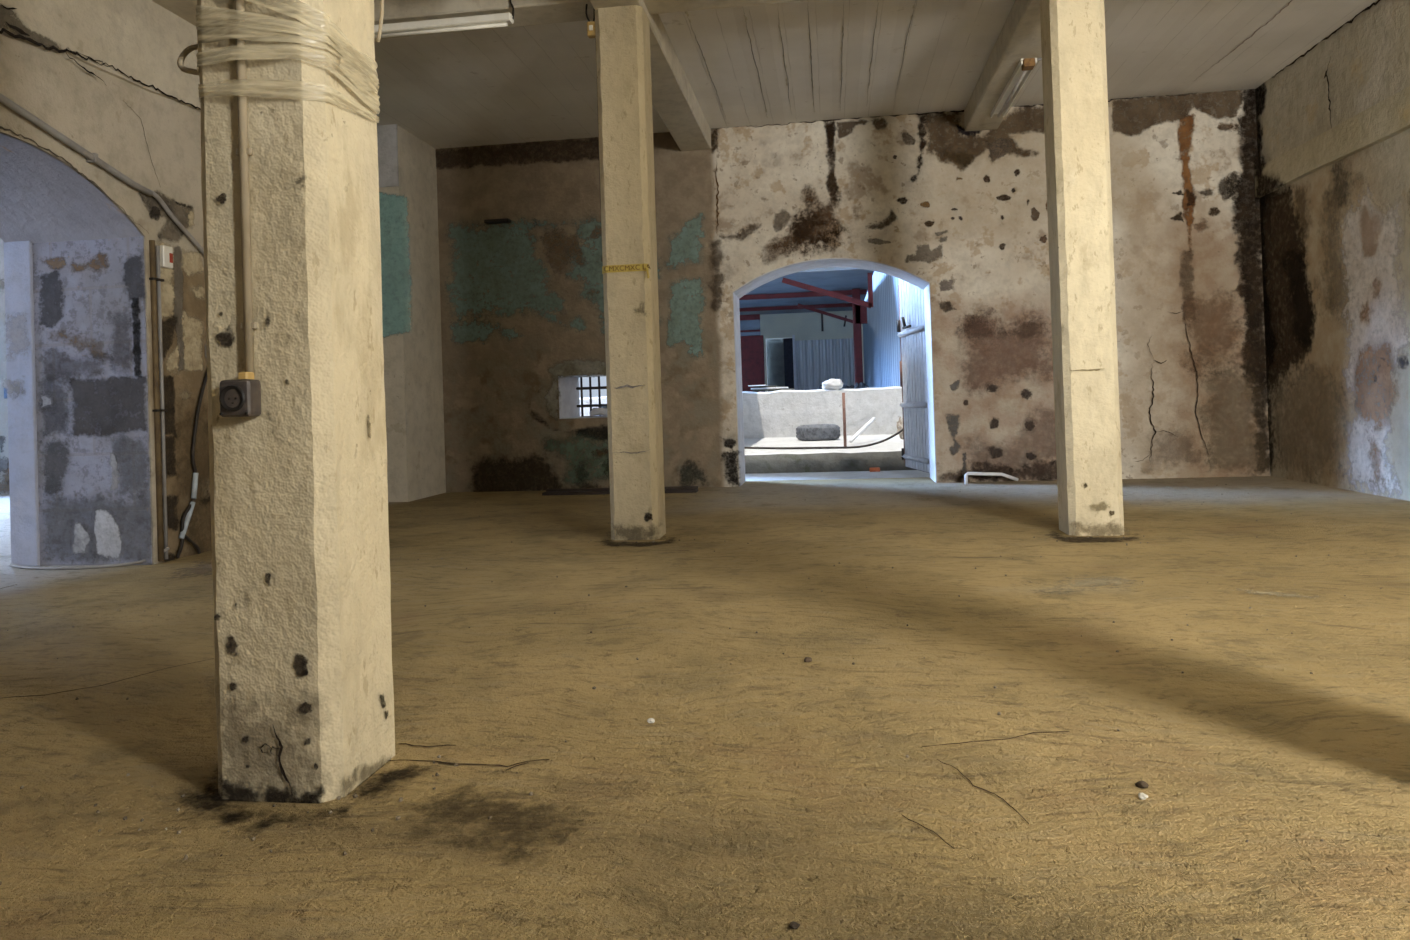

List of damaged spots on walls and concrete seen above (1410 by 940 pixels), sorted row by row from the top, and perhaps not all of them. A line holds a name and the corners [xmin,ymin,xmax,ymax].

spalling [0,5,59,49]
crack [0,5,201,179]
damp [837,118,888,138]
damp [902,106,1045,182]
damp [723,187,845,260]
peeling [535,217,605,334]
peeling [657,213,705,358]
damp [1112,83,1410,497]
damp [963,311,1053,390]
spalling [616,513,657,540]